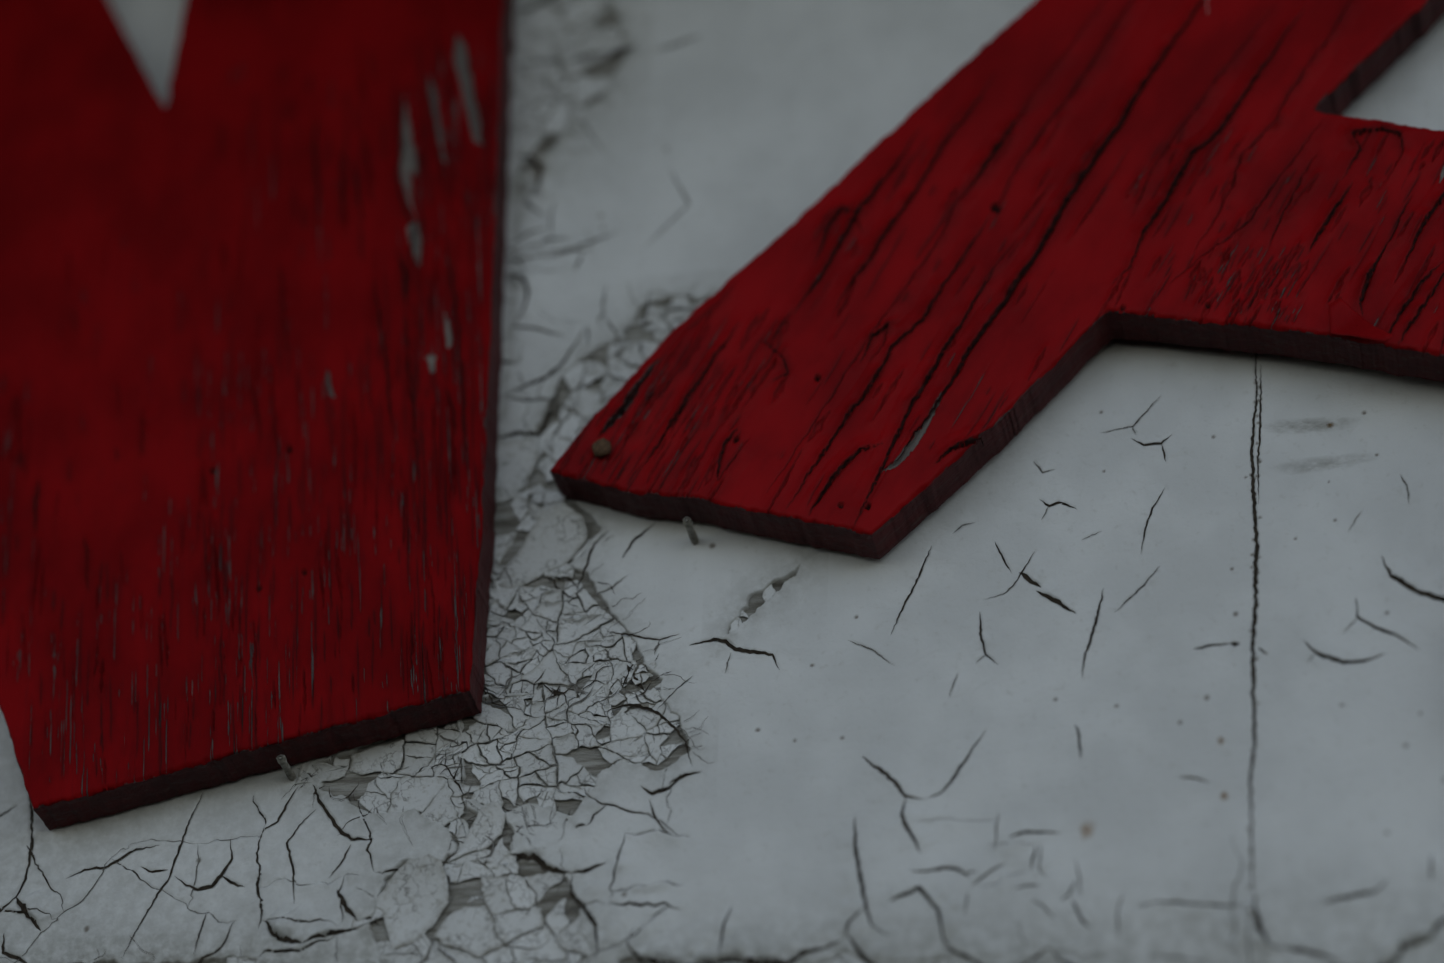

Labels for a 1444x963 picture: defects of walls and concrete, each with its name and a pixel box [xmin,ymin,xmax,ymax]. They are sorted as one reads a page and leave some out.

crack [498,154,694,442]
crack [768,0,1203,526]
crack [641,329,788,469]
peeling [283,281,718,963]
peeling [729,575,796,633]
crack [511,353,1338,963]
crack [1303,600,1419,664]
crack [1381,556,1444,602]
crack [0,785,398,963]
crack [1323,880,1387,903]
crack [1392,918,1444,963]